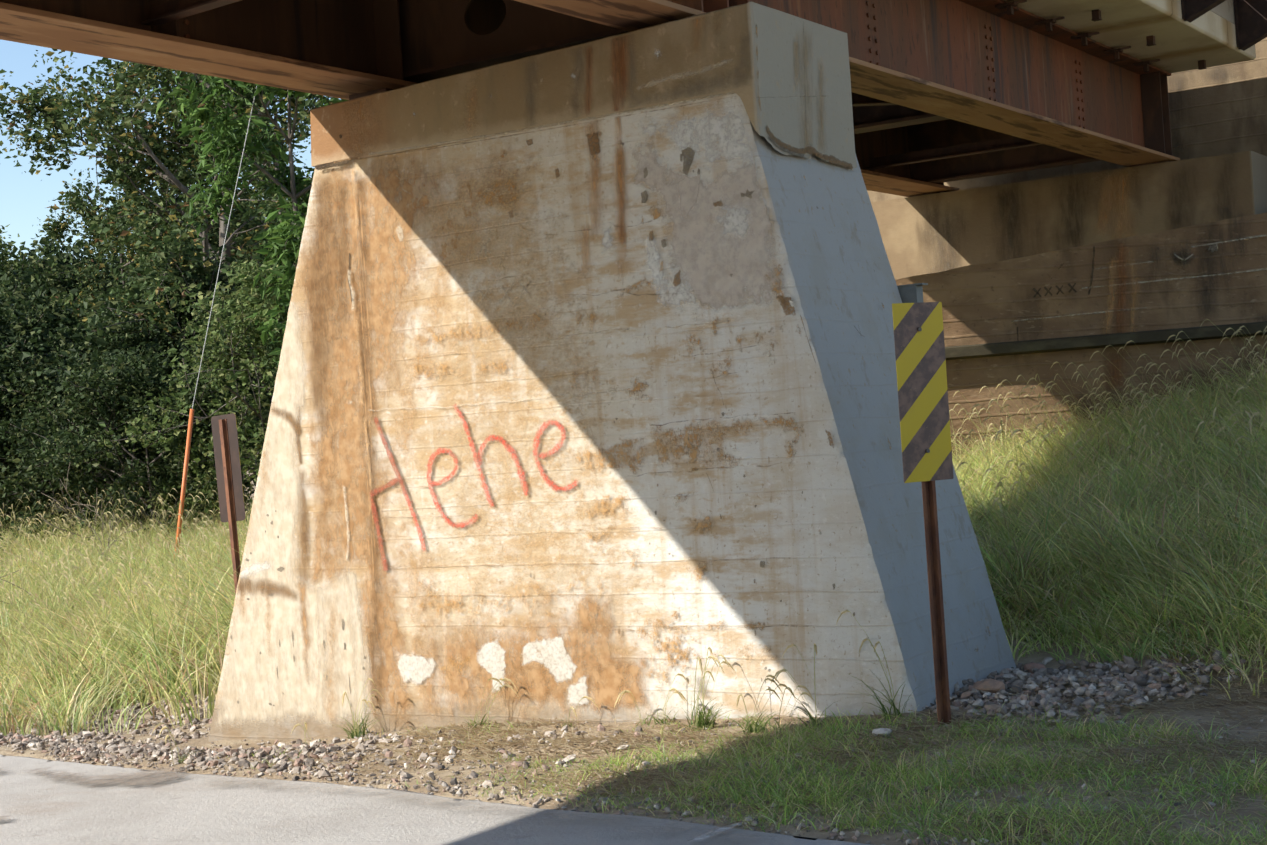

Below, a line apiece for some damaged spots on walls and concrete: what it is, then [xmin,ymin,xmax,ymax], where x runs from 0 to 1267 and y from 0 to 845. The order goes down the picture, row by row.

spalling [587,133,600,155]
spalling [680,147,700,175]
spalling [766,125,853,170]
spalling [641,167,681,286]
spalling [766,265,795,315]
water stain [238,165,801,715]